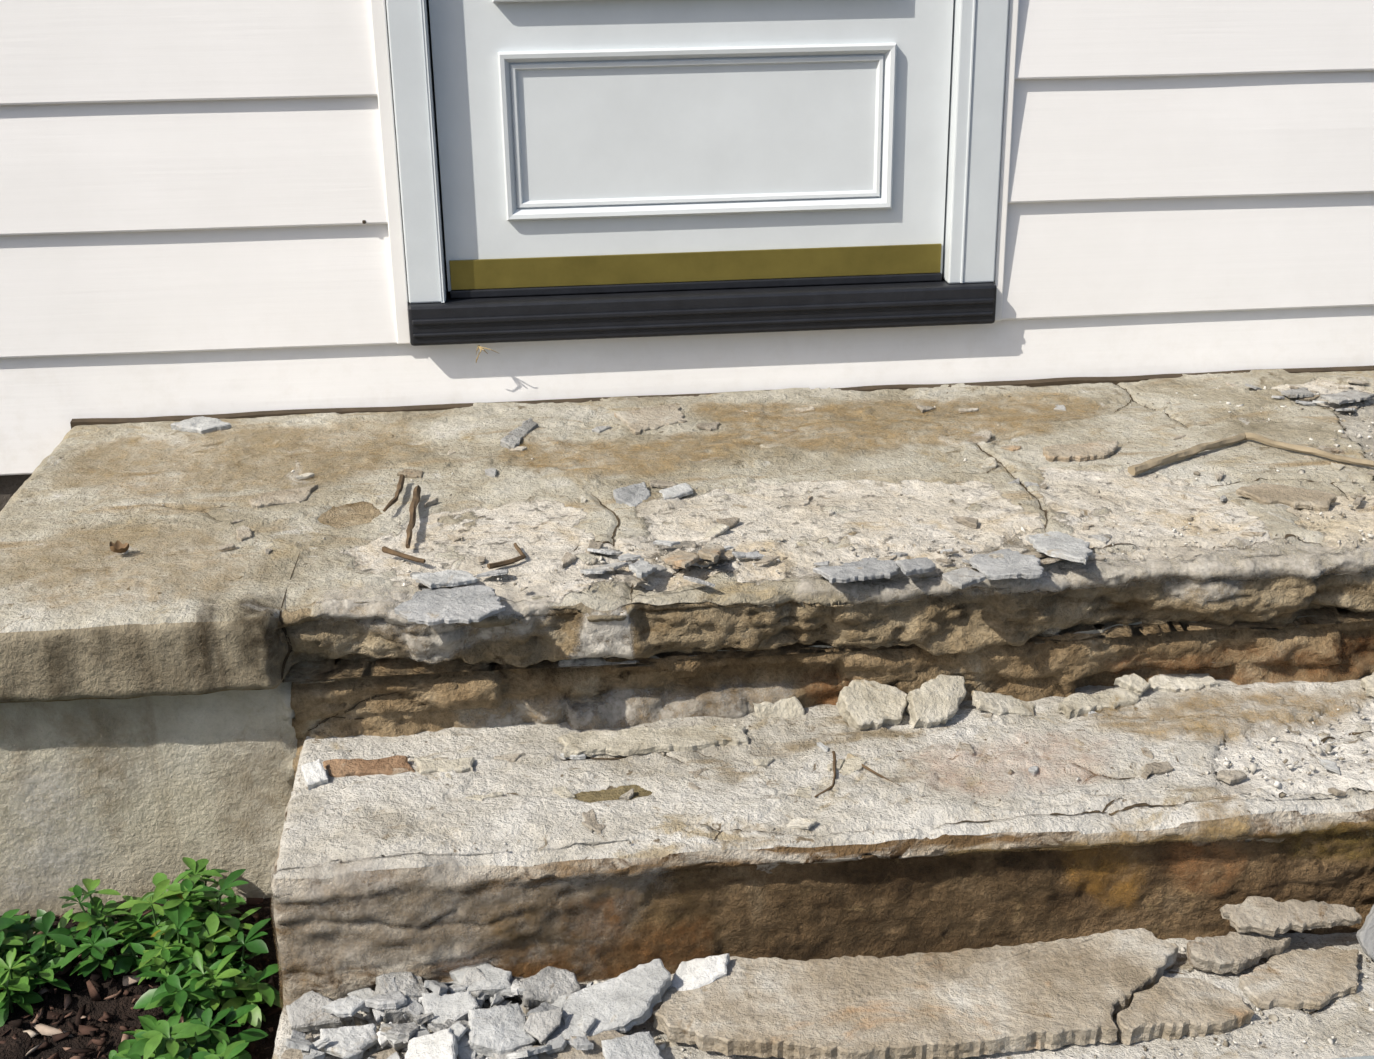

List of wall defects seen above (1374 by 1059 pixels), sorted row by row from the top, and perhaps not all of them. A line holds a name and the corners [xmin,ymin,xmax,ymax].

crack [1114,384,1183,425]
peeling [1245,379,1374,476]
crack [953,443,1048,532]
spalling [277,467,1374,777]
spalling [1214,703,1374,799]
peeling [0,908,198,1059]
spalling [215,820,1374,1059]